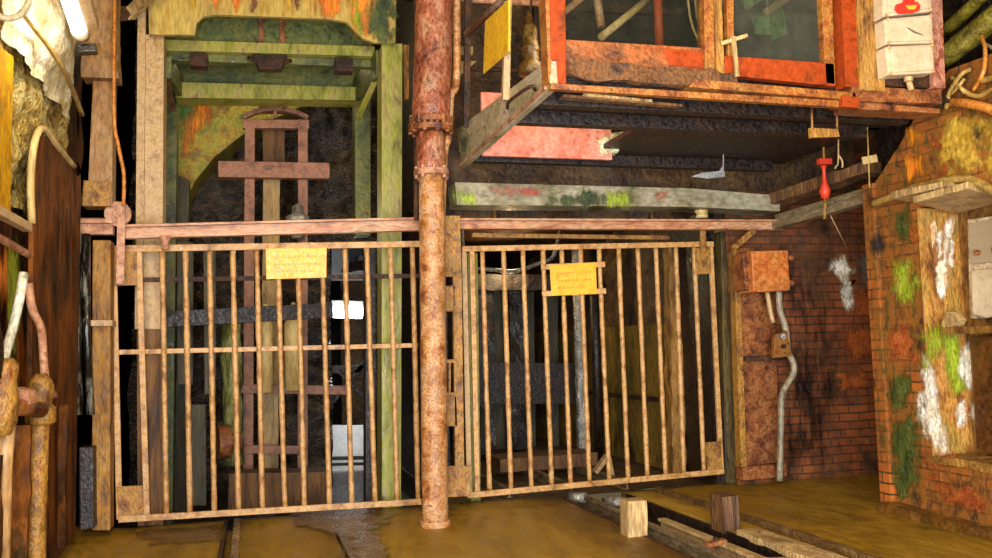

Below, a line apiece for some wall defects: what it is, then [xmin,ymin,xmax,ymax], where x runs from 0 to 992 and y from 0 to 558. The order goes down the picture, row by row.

water stain [917,358,947,452]
water stain [942,335,975,426]